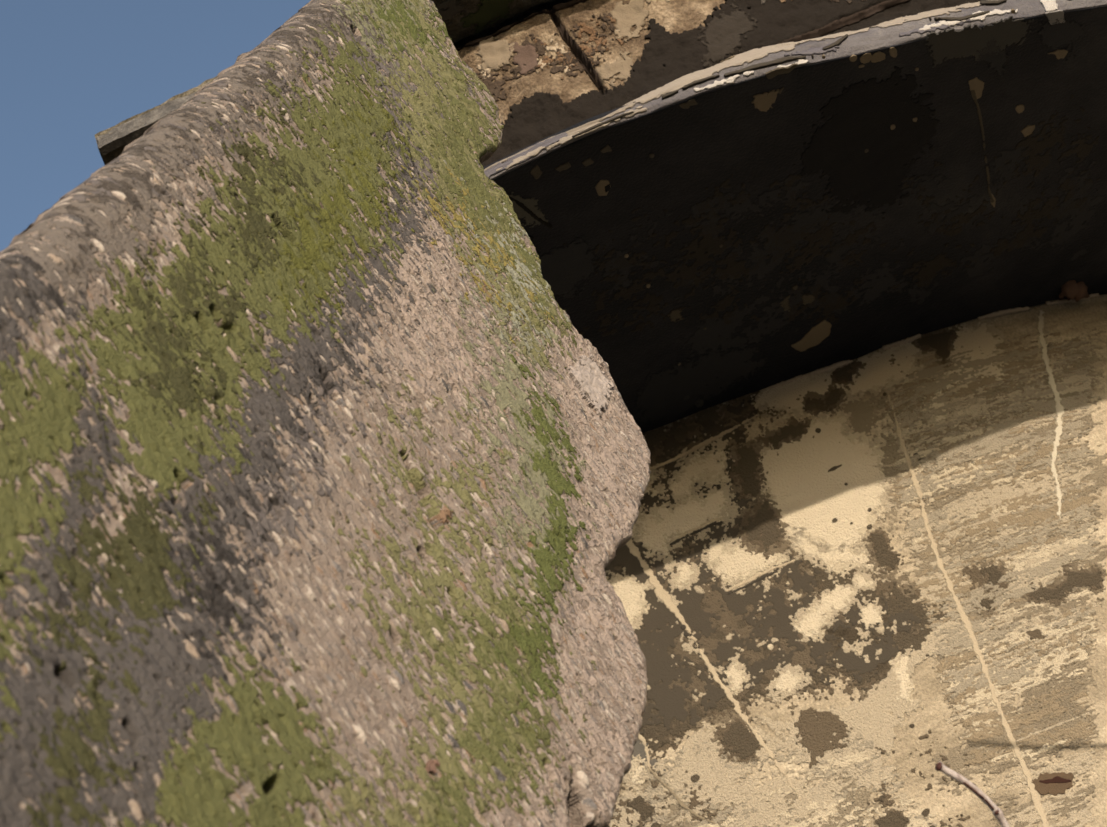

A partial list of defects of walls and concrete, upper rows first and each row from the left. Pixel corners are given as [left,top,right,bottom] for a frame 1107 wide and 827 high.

spalling [471,35,544,75]
peeling [484,0,1018,179]
peeling [1040,0,1058,12]
spalling [333,204,512,454]
crack [1038,310,1064,518]
spalling [480,315,854,827]
damp [604,323,1107,827]
peeling [783,508,948,692]
crack [885,389,1049,827]
peeling [1029,563,1103,603]
peeling [866,782,908,827]
peeling [909,724,976,827]